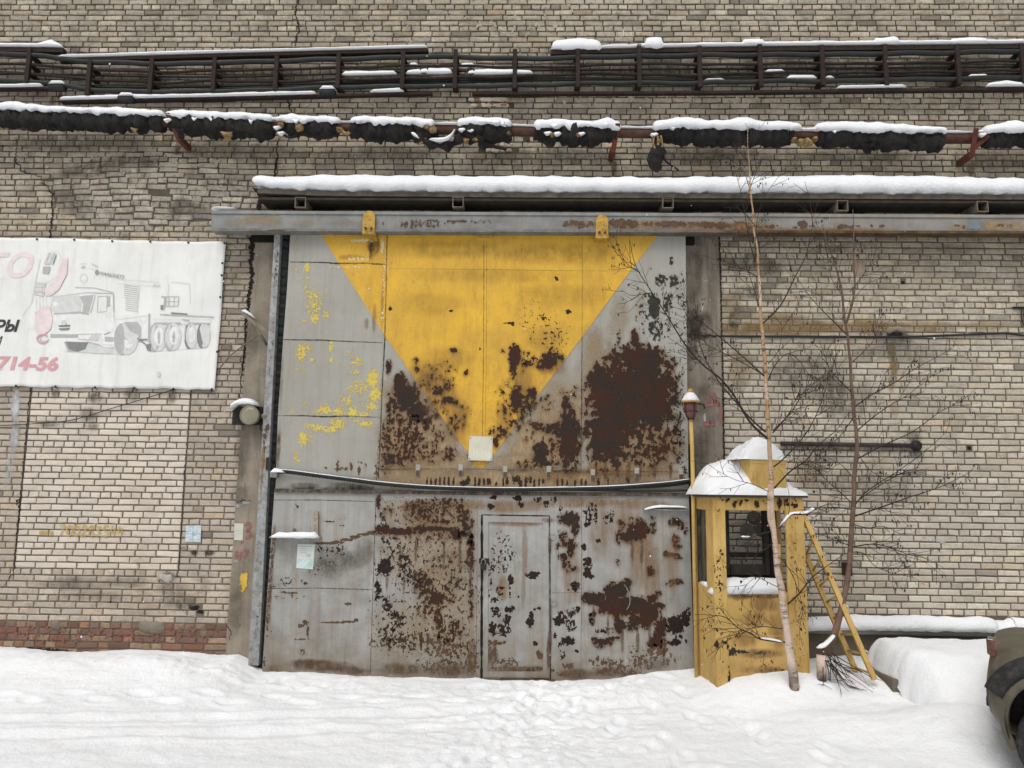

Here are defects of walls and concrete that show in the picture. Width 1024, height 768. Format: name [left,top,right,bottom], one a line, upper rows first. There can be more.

crack [15,139,55,238]
peeling [349,238,392,321]
peeling [291,257,691,679]
corrosion [380,362,678,489]
peeling [253,542,345,642]
corrosion [399,499,473,591]
corrosion [733,594,779,618]